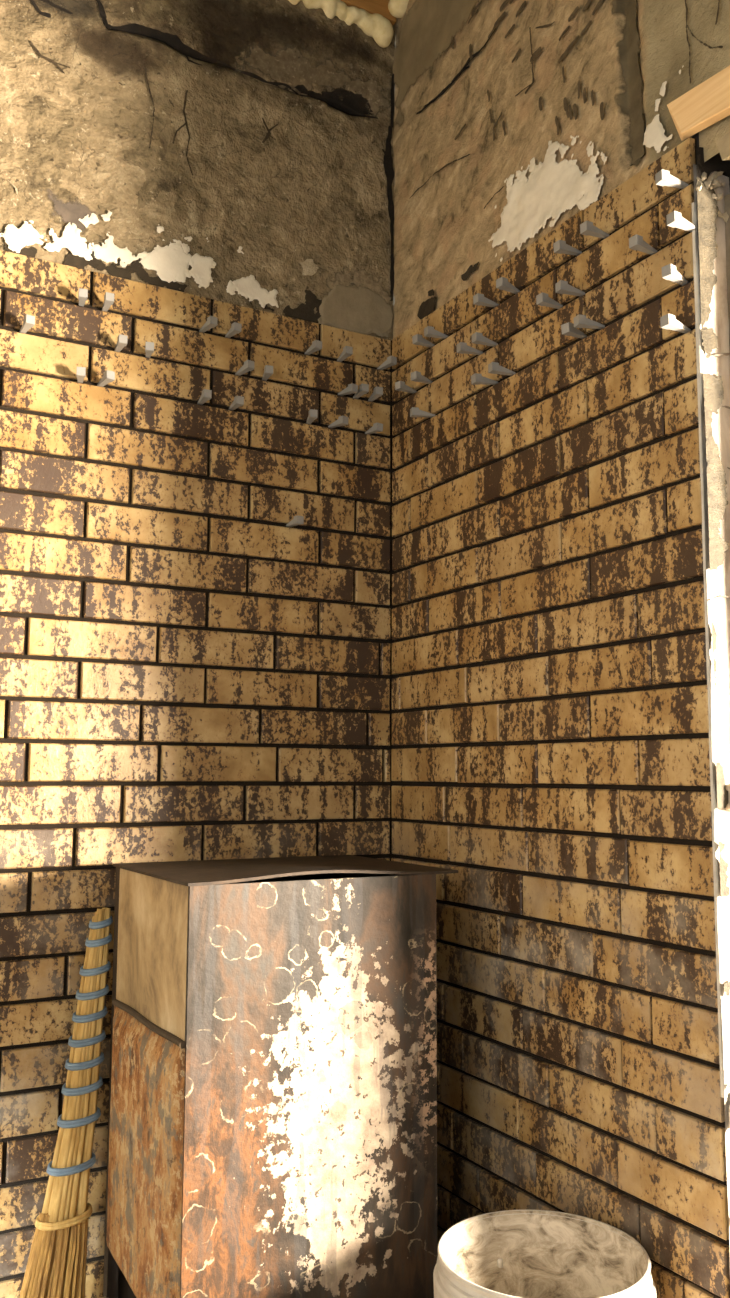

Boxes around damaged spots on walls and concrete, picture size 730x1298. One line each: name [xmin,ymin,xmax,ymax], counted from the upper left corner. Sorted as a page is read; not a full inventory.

crack [515,21,555,97]
crack [30,0,496,301]
peeling [488,136,607,262]
peeling [0,211,279,308]
spalling [417,289,436,319]
spalling [461,261,479,281]